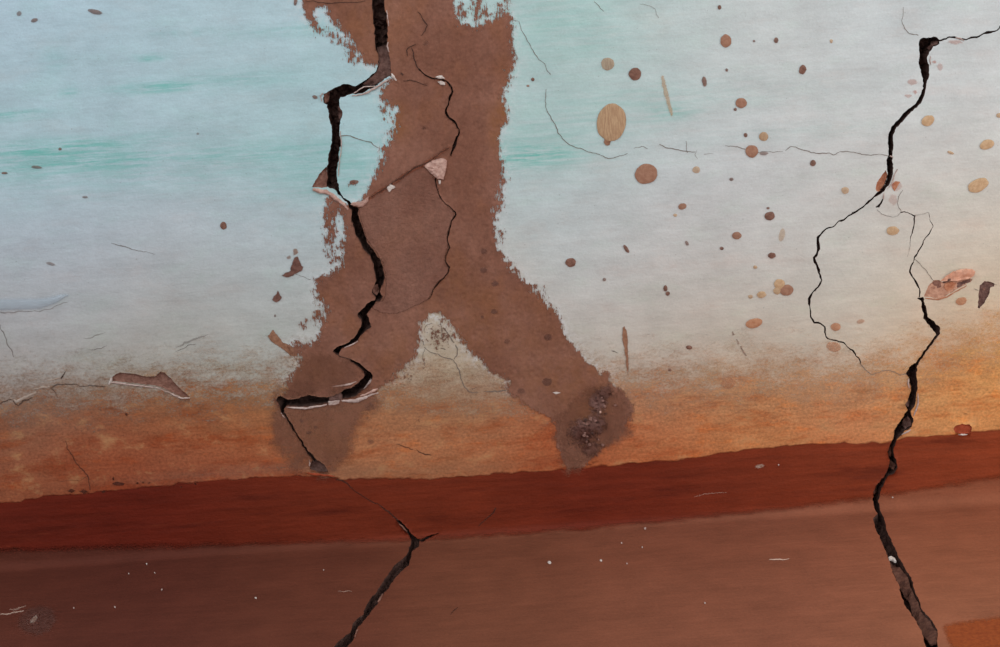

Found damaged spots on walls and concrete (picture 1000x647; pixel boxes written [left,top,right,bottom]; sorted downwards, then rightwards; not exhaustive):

crack [514,20,691,159]
peeling [0,371,190,406]
crack [277,0,460,647]
rust [0,333,1000,503]
crack [733,17,1000,647]
peeling [924,269,996,308]